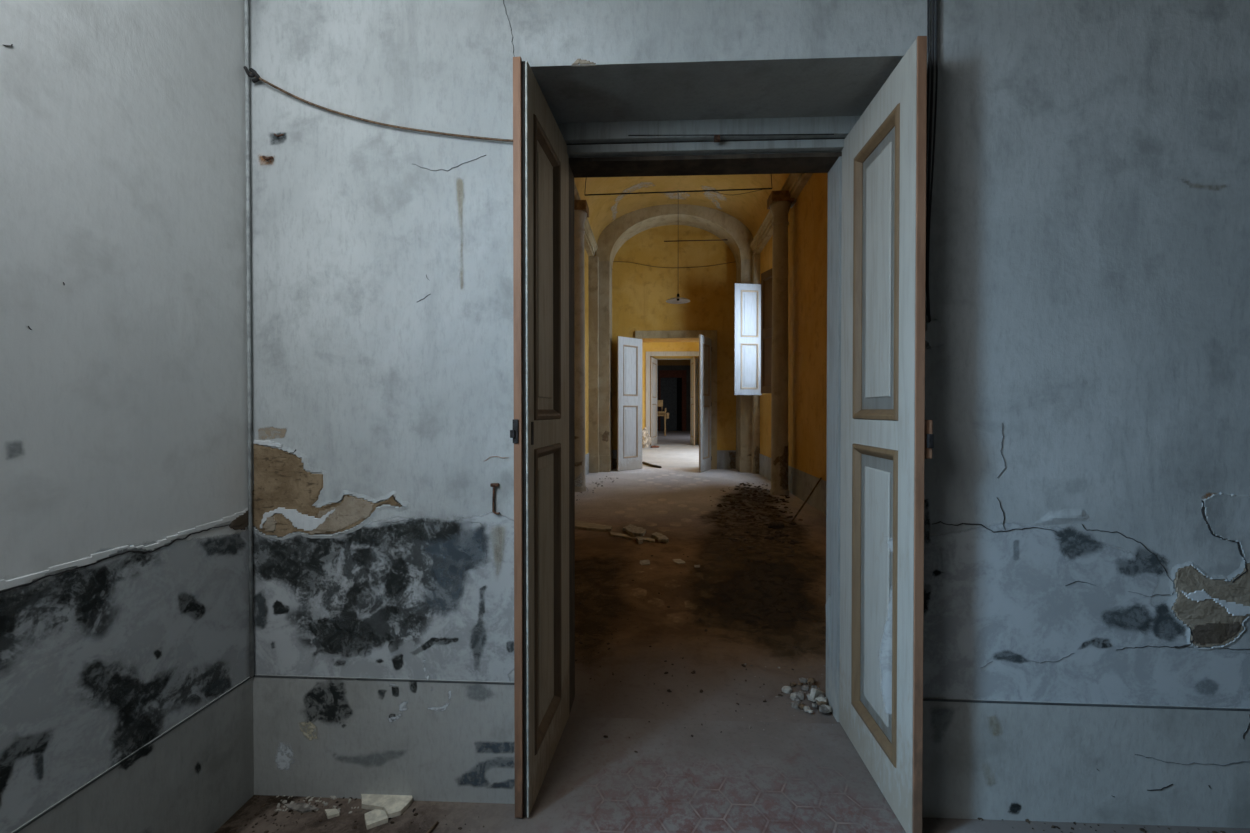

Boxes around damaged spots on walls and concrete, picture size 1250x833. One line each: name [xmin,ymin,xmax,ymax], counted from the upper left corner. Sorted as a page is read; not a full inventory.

spalling [0,427,410,593]
damp [0,513,515,833]
damp [880,590,892,714]
crack [934,423,1175,597]
damp [923,500,1250,732]
crack [1118,626,1250,650]
crack [1135,714,1250,791]
spalling [1166,500,1250,652]